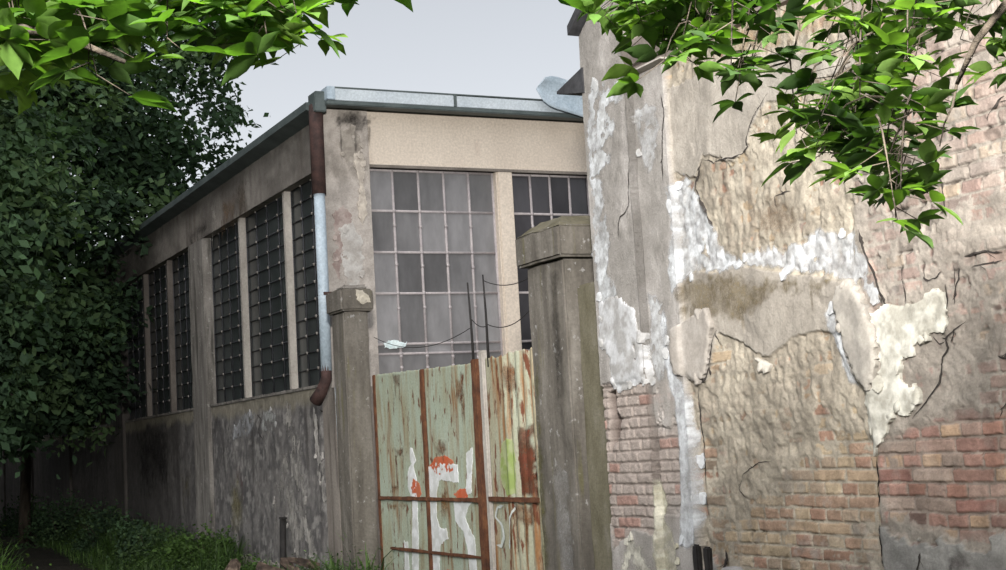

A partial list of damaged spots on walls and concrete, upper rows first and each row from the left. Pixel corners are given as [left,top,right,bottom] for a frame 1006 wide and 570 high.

flaking render [332,124,371,304]
flaking render [587,77,1006,570]
crack [858,230,1002,419]
corrosion [511,425,538,541]